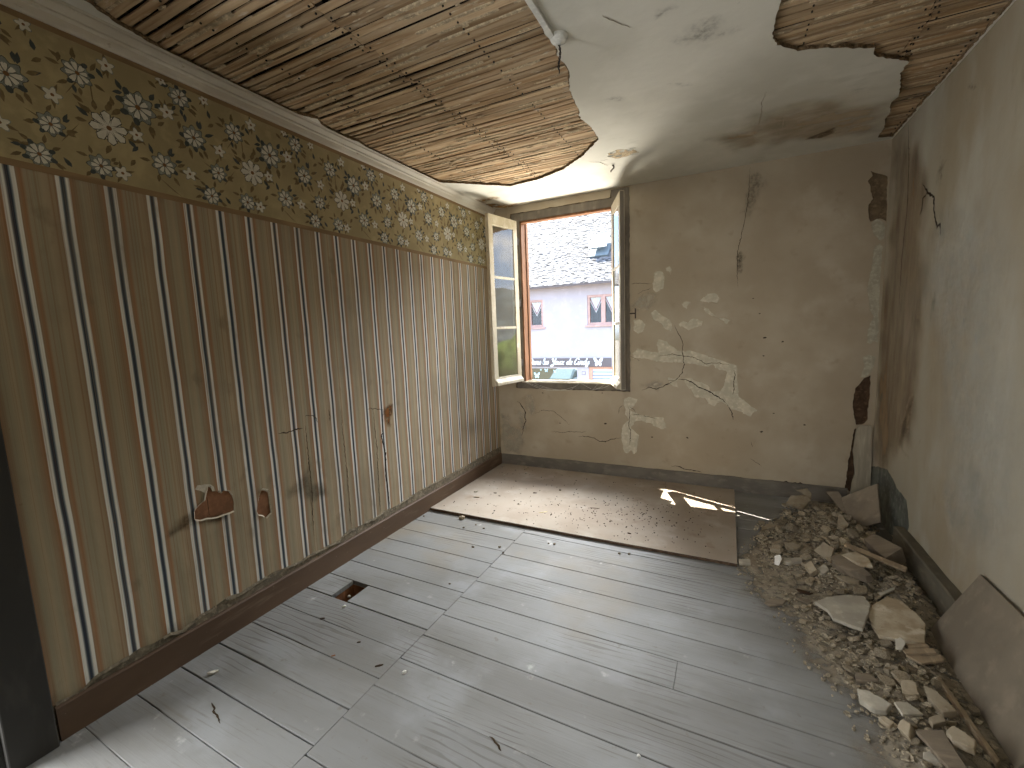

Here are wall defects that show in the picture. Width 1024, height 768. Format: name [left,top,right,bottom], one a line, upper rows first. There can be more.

spalling [249,90,377,152]
spalling [435,132,598,186]
spalling [868,172,887,222]
crack [899,130,941,297]
crack [517,327,736,442]
peeling [621,397,668,454]
peeling [632,293,757,417]
spalling [845,376,870,492]
damp [877,151,925,464]
peeling [55,447,500,706]